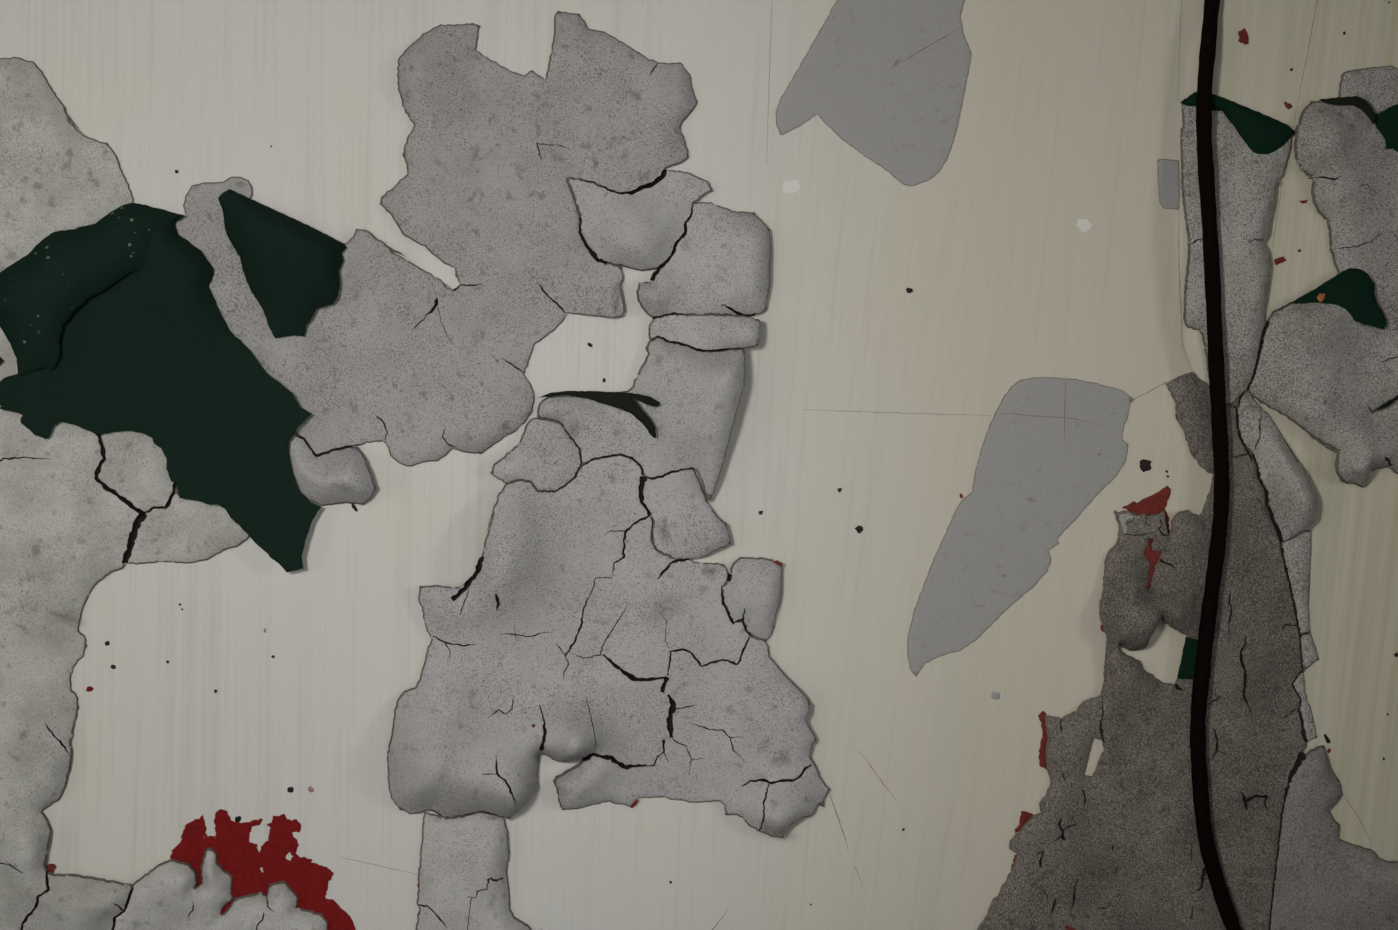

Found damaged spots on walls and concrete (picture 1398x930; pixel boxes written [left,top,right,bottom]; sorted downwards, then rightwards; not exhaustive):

peeling [0,328,18,381]
peeling [0,57,134,272]
crack [537,143,667,265]
crack [650,205,693,281]
crack [649,304,755,352]
crack [94,434,177,564]
peeling [175,11,831,930]
peeling [977,101,1398,930]
peeling [0,406,328,930]
crack [433,424,812,831]
crack [1174,321,1309,930]
crack [0,861,50,930]